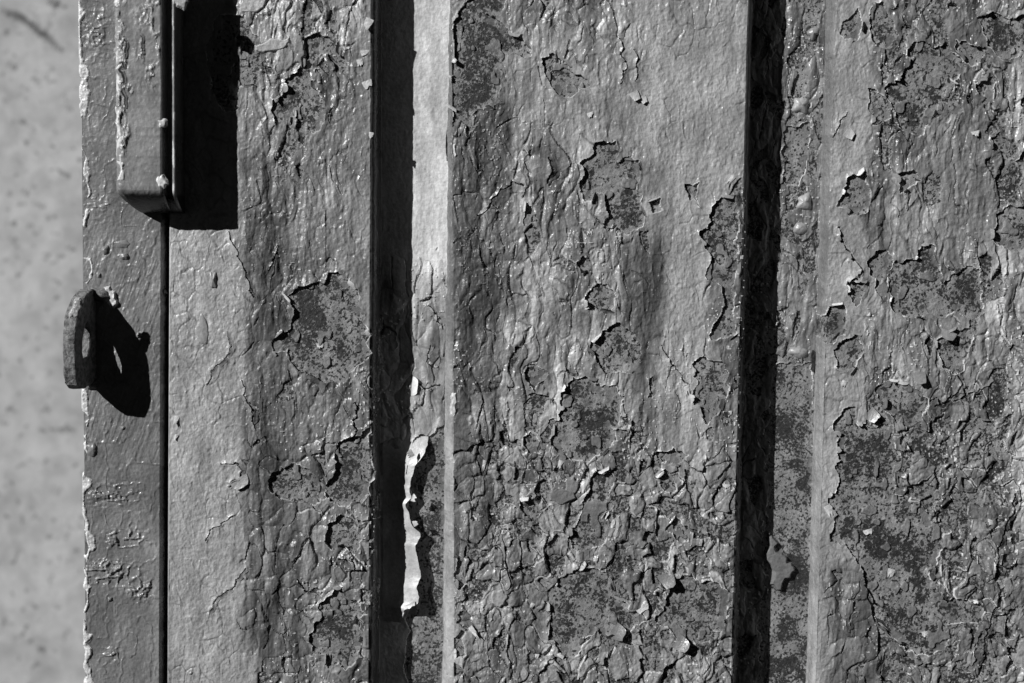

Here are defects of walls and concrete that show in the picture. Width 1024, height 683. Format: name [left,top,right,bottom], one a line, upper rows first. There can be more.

peeling [445,0,590,137]
crack [204,512,235,538]
crack [210,569,248,615]
crack [208,332,255,432]
crack [221,460,246,487]
crack [295,580,322,595]
peeling [272,272,371,382]
crack [349,403,357,437]
peeling [268,393,474,683]
peeling [520,284,730,659]
peeling [756,362,814,683]
peeling [828,379,987,656]